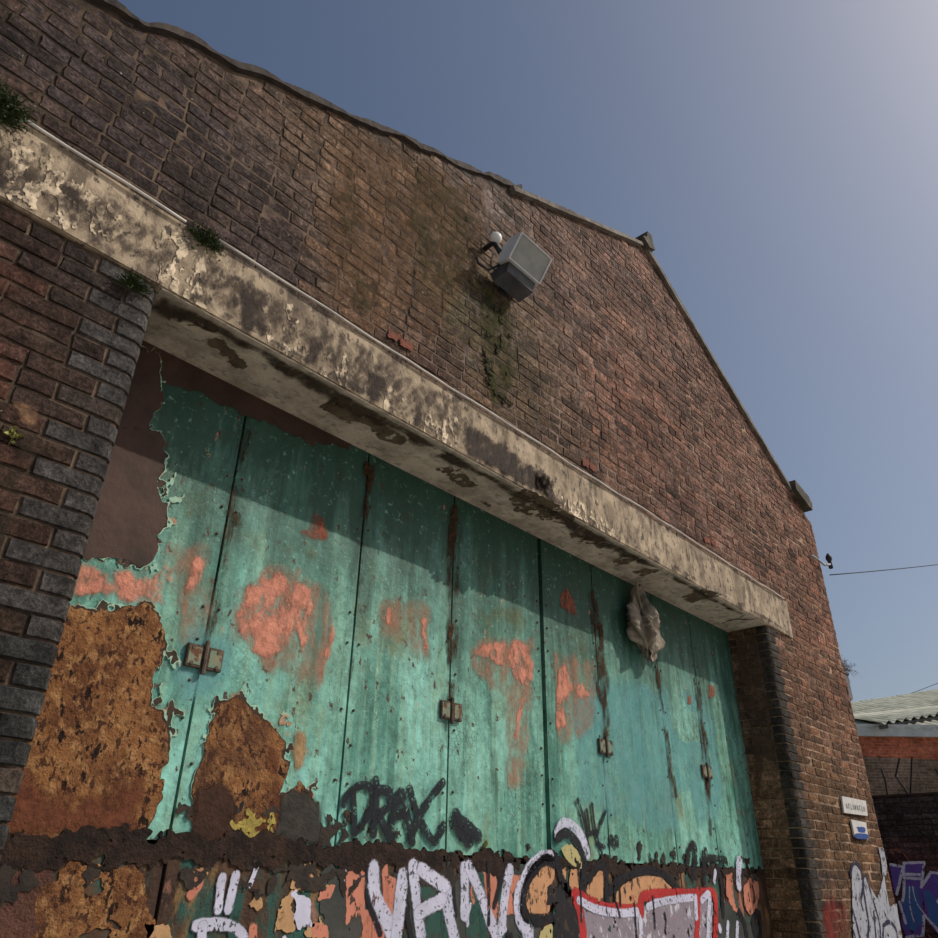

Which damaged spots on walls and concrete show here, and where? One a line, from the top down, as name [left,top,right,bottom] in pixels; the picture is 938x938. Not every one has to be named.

leakage [0,137,173,268]
peeling [75,340,352,602]
leakage [152,262,660,568]
corrosion [7,599,185,842]
corrosion [189,688,320,842]
peeling [236,570,335,683]
peeling [473,640,534,750]
corrosion [588,590,610,739]
leakage [674,547,787,632]
corrosion [0,855,156,938]
corrosion [235,857,361,900]
corrosion [411,861,461,890]